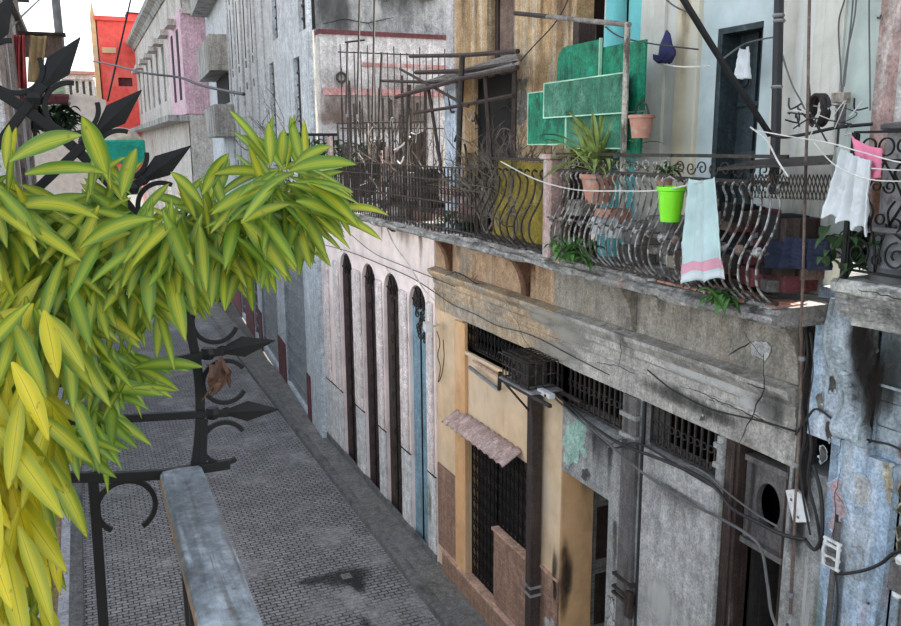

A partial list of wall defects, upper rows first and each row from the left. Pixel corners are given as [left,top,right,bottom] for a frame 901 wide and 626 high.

spalling [749,340,774,364]
crack [681,332,785,443]
peeling [561,415,592,482]
peeling [826,471,872,538]
spalling [882,461,901,560]
leakage [553,562,572,601]